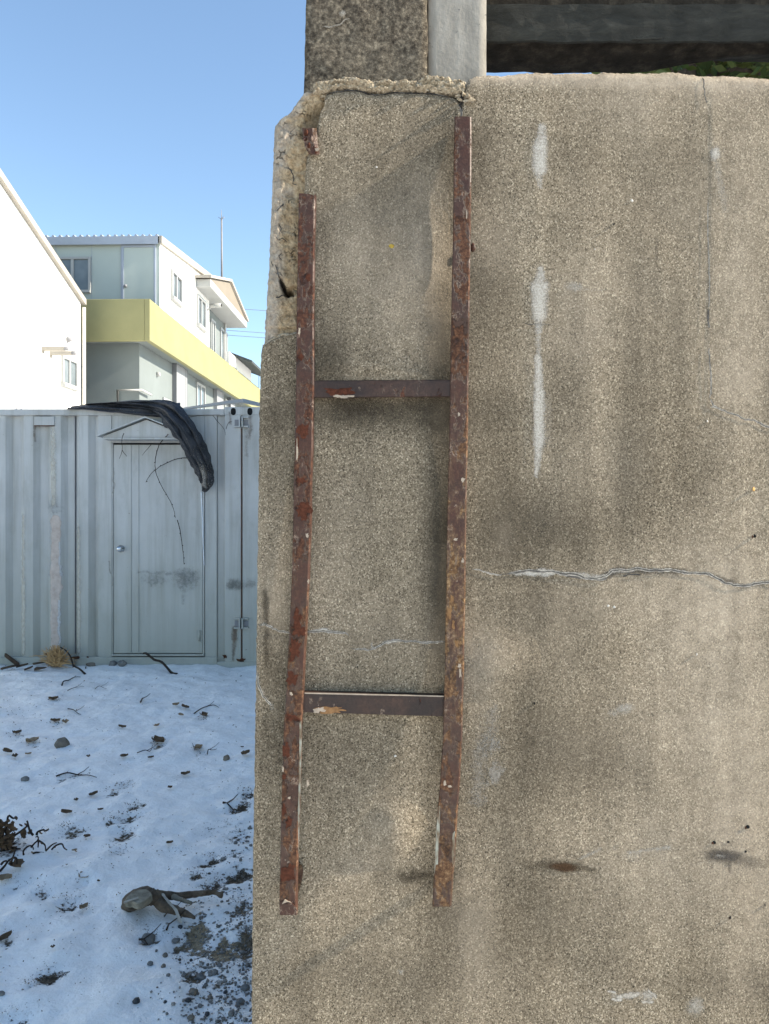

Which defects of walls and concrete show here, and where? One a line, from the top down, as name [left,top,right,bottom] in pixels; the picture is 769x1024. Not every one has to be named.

water stain [533,124,547,185]
spalling [262,75,477,346]
water stain [531,267,548,477]
crack [473,567,769,587]
corrosion [549,863,592,872]
water stain [709,850,742,871]